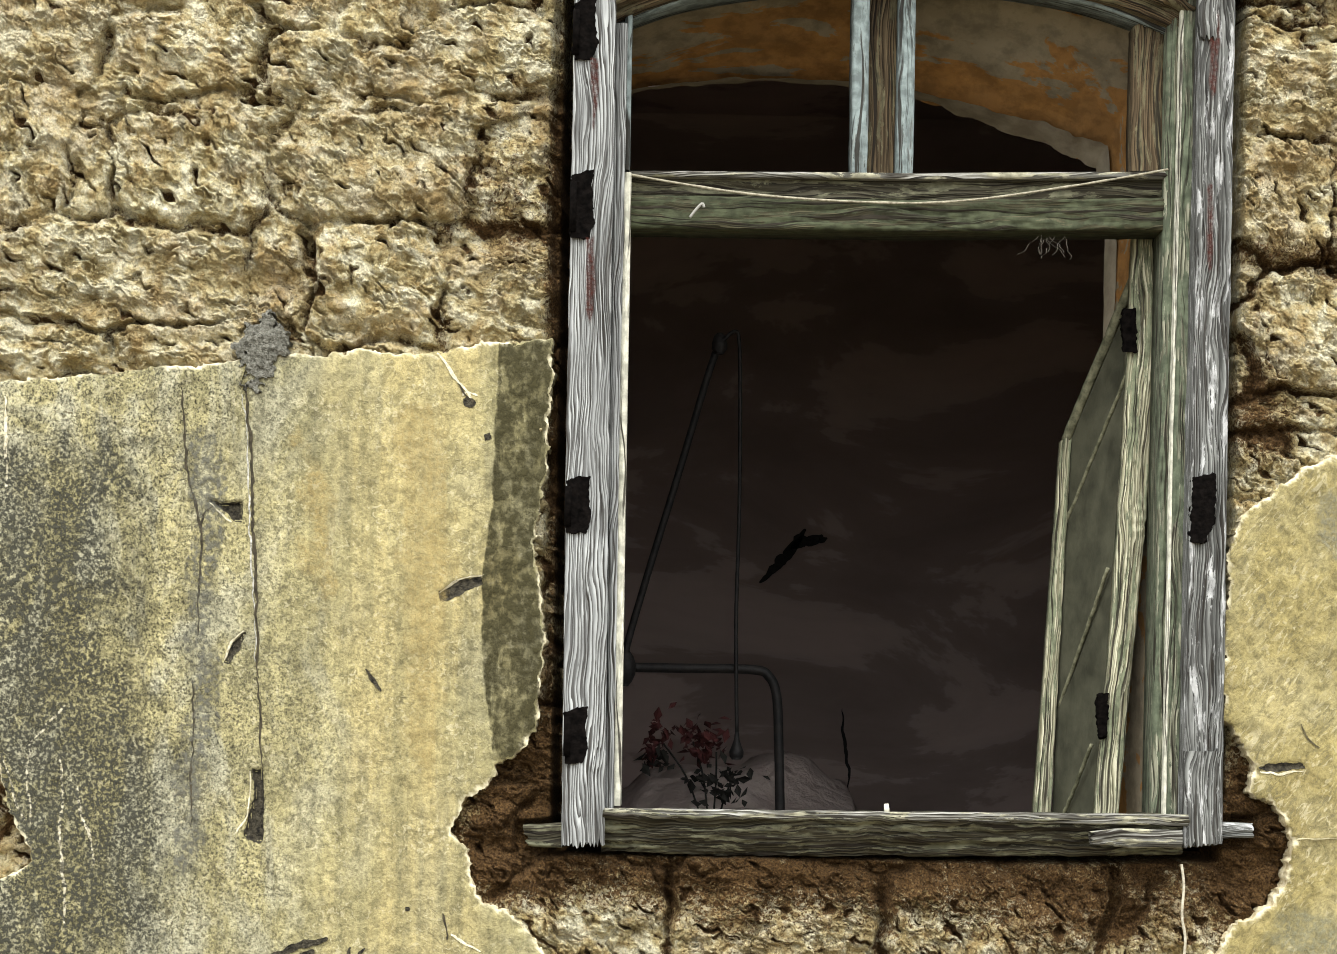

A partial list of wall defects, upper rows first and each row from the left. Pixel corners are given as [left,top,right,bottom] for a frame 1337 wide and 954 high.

flaking render [0,0,575,439]
flaking render [1226,0,1337,546]
crack [188,680,196,827]
crack [181,387,263,767]
peeling [209,501,243,522]
spalling [442,914,481,952]
flaking render [450,430,1289,954]
peeling [1259,762,1305,776]